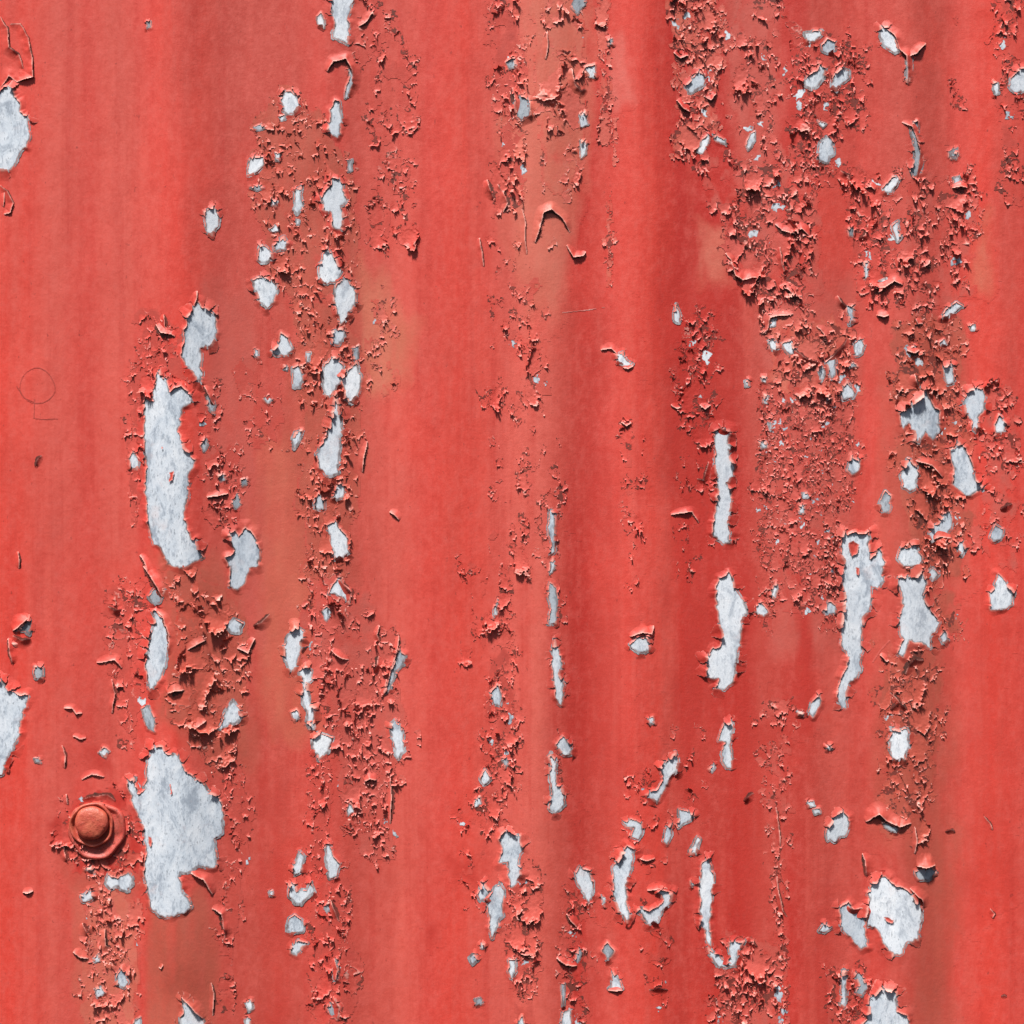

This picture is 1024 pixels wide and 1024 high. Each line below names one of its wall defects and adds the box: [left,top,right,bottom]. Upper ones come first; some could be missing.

peeling [0,17,39,214]
peeling [0,661,47,779]
peeling [49,0,421,1024]
peeling [449,0,1024,1024]